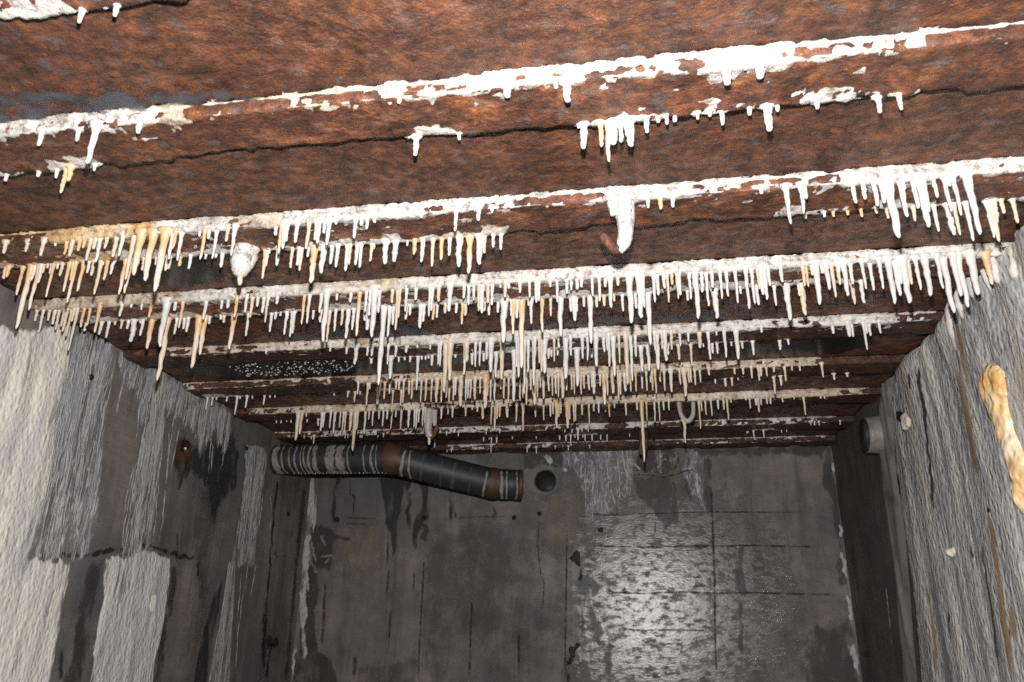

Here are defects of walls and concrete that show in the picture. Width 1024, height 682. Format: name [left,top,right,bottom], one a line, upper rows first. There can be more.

damp [0,156,1024,682]